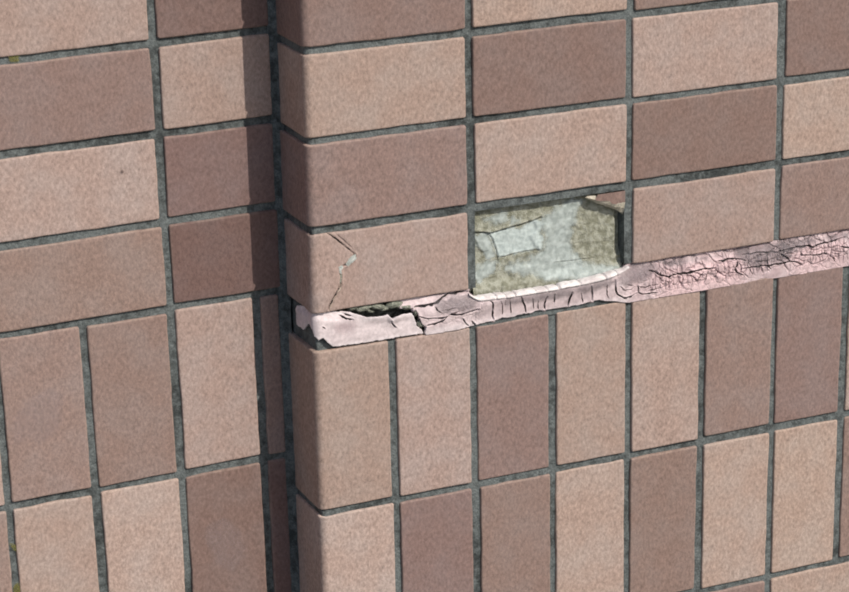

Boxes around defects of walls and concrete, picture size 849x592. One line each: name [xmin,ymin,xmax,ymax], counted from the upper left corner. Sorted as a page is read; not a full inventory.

crack [328,233,356,309]
spalling [469,191,629,301]
crack [416,238,849,325]
peeling [296,305,423,347]